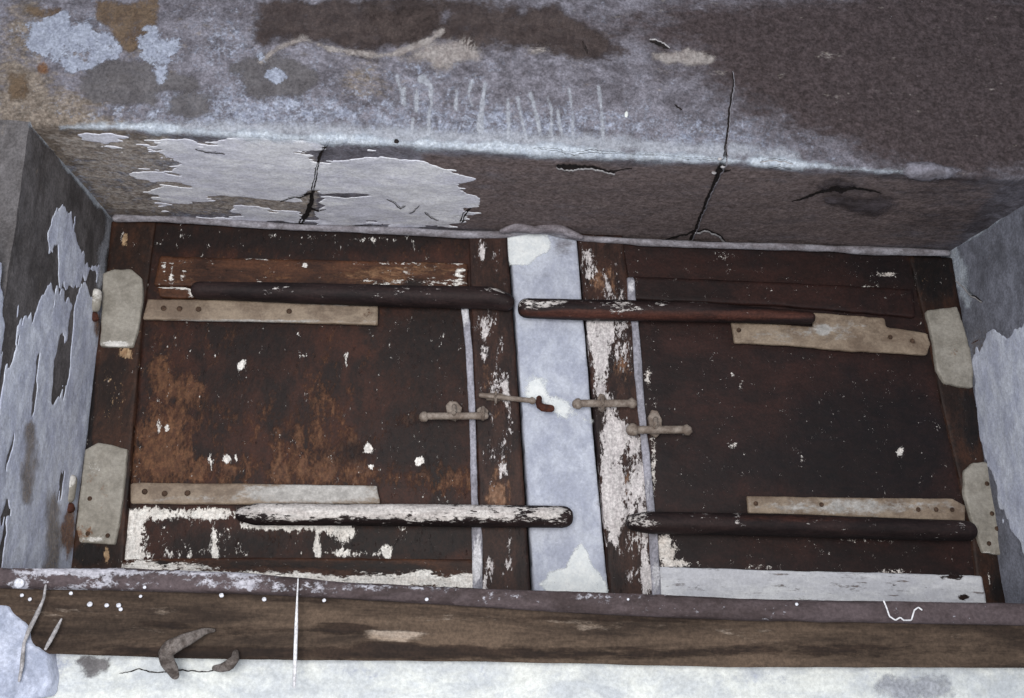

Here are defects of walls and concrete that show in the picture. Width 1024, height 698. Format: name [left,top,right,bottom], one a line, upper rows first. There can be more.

peeling [78,133,481,228]
crack [280,141,330,224]
damp [61,0,845,171]
crack [538,72,735,242]
peeling [0,204,102,569]
peeling [972,323,1024,554]